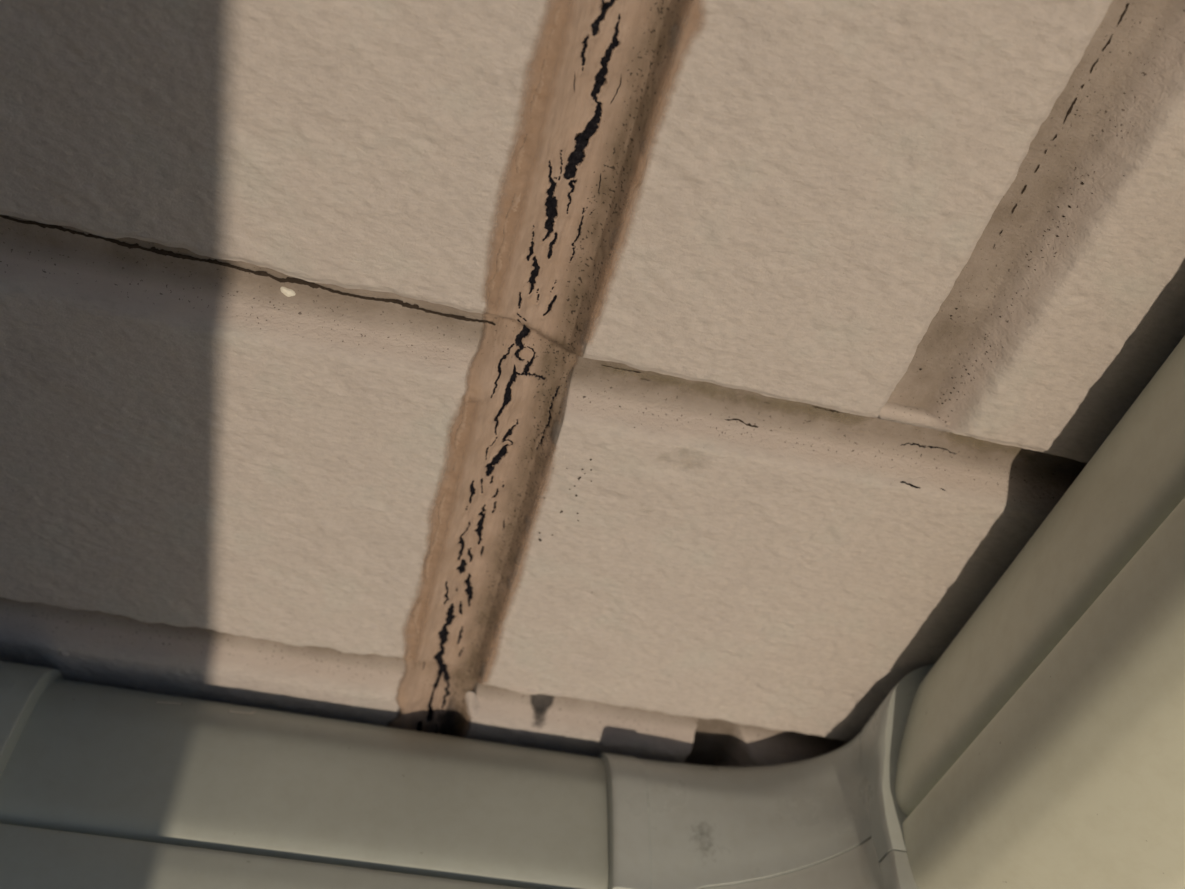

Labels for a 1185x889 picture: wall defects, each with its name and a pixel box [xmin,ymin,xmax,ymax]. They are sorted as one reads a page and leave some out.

water stain [1035,3,1129,173]
crack [415,0,622,734]
water stain [531,694,554,724]